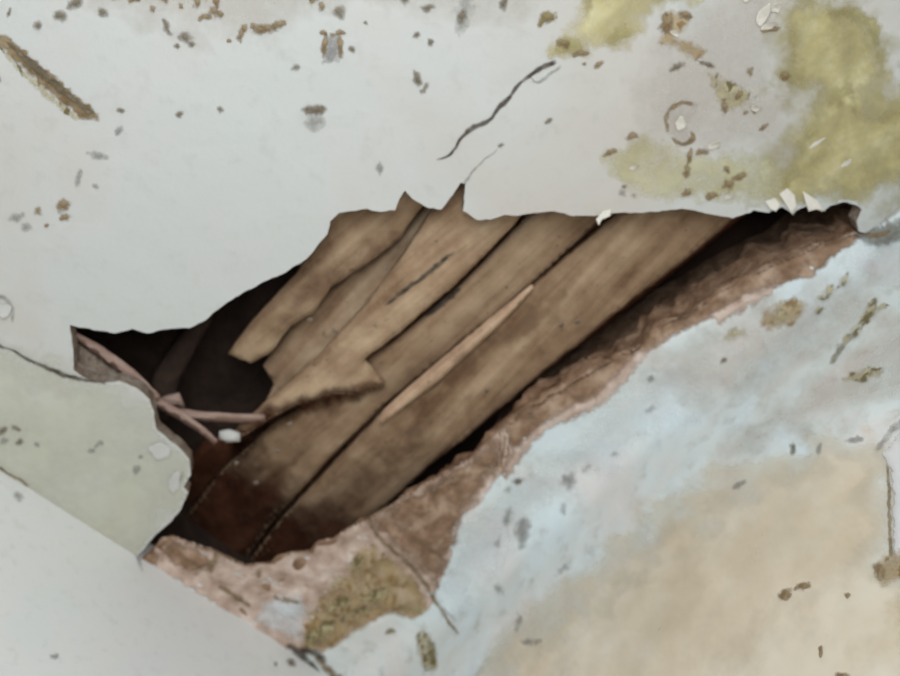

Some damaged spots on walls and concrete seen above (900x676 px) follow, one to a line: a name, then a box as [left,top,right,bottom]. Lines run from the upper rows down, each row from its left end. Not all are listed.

damp [550,0,660,68]
spalling [0,35,98,119]
crack [440,61,558,159]
damp [603,0,900,200]
peeling [57,198,69,221]
peeling [596,209,611,225]
peeling [765,188,825,214]
spalling [154,230,861,665]
peeling [879,426,900,556]
damp [480,438,900,676]
crack [288,644,341,676]